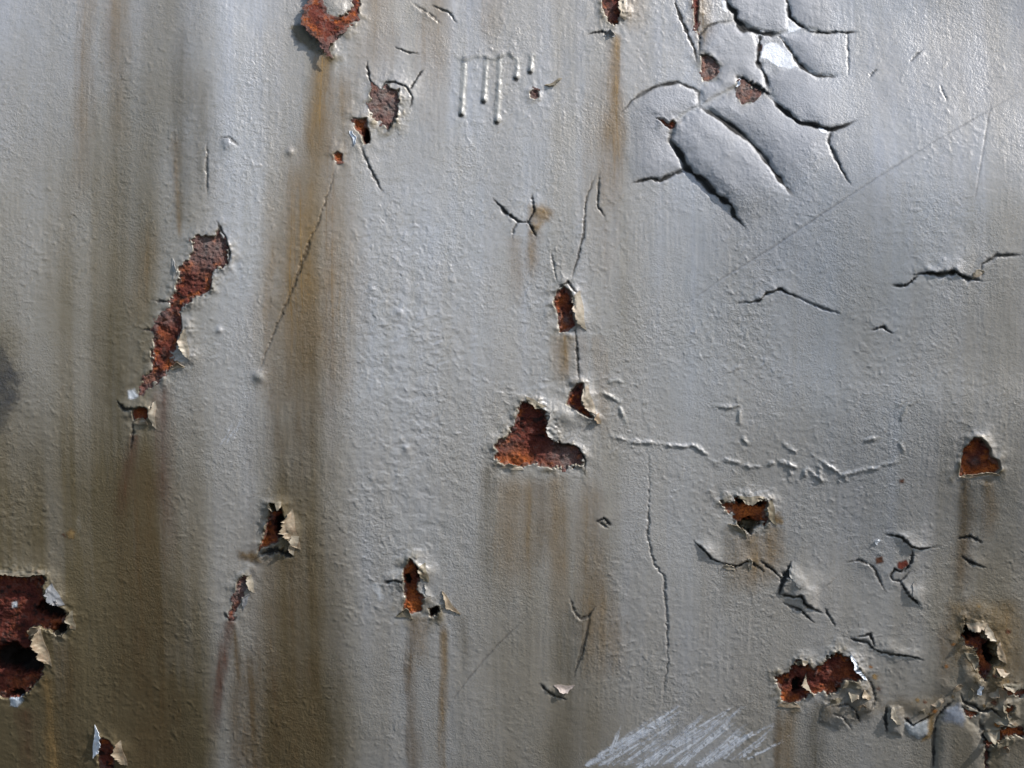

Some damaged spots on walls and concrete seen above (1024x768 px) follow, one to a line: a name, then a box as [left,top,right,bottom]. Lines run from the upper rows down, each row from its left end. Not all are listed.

peeling [691,0,701,35]
peeling [699,55,720,81]
peeling [760,42,798,68]
peeling [735,78,761,104]
crack [495,197,549,235]
crack [894,254,1014,287]
crack [756,288,797,302]
crack [851,534,929,608]
crack [762,562,834,624]
peeling [0,570,76,707]
crack [853,633,918,658]
peeling [883,622,1024,768]